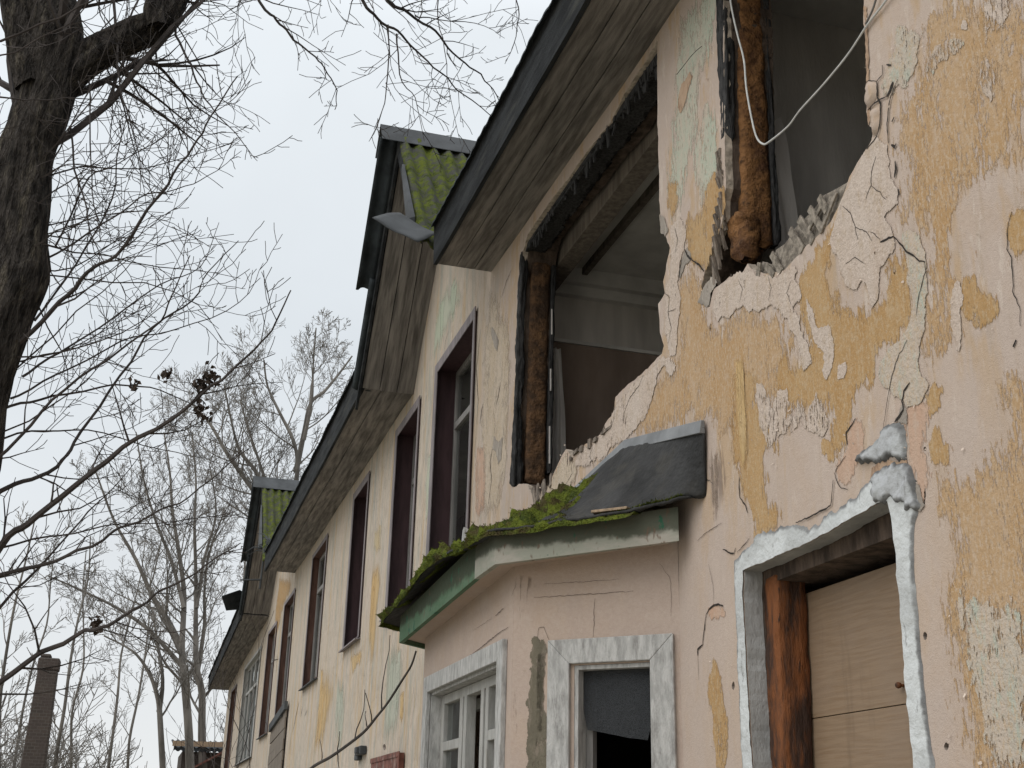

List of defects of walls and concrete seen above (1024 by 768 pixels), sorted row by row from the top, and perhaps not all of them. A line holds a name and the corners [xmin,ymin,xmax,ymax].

crack [845,64,926,313]
crack [1006,212,1020,347]
peeling [472,0,1024,768]
crack [883,340,910,427]
crack [796,418,856,523]
crack [697,524,749,656]